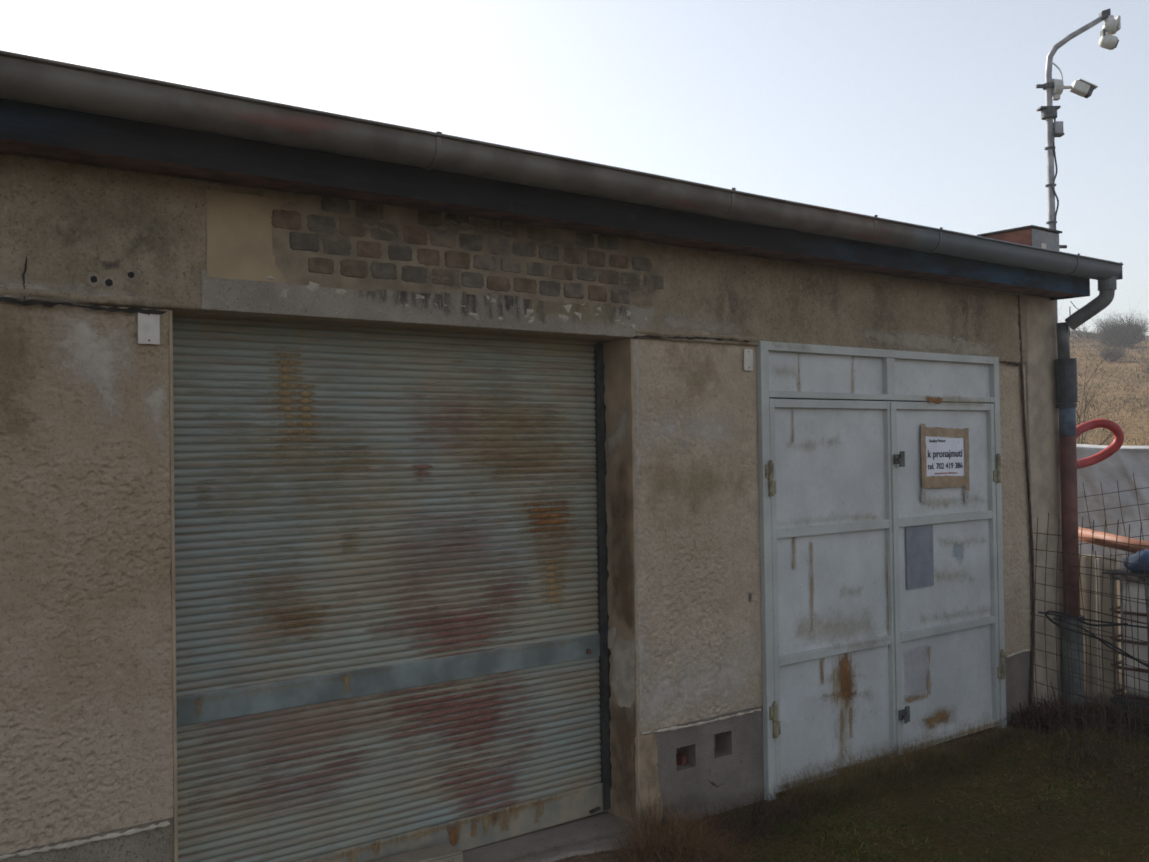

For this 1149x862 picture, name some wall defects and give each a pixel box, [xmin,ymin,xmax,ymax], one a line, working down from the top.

crack [0,256,171,315]
spalling [265,195,664,329]
rust [821,655,885,772]
rust [926,710,949,728]